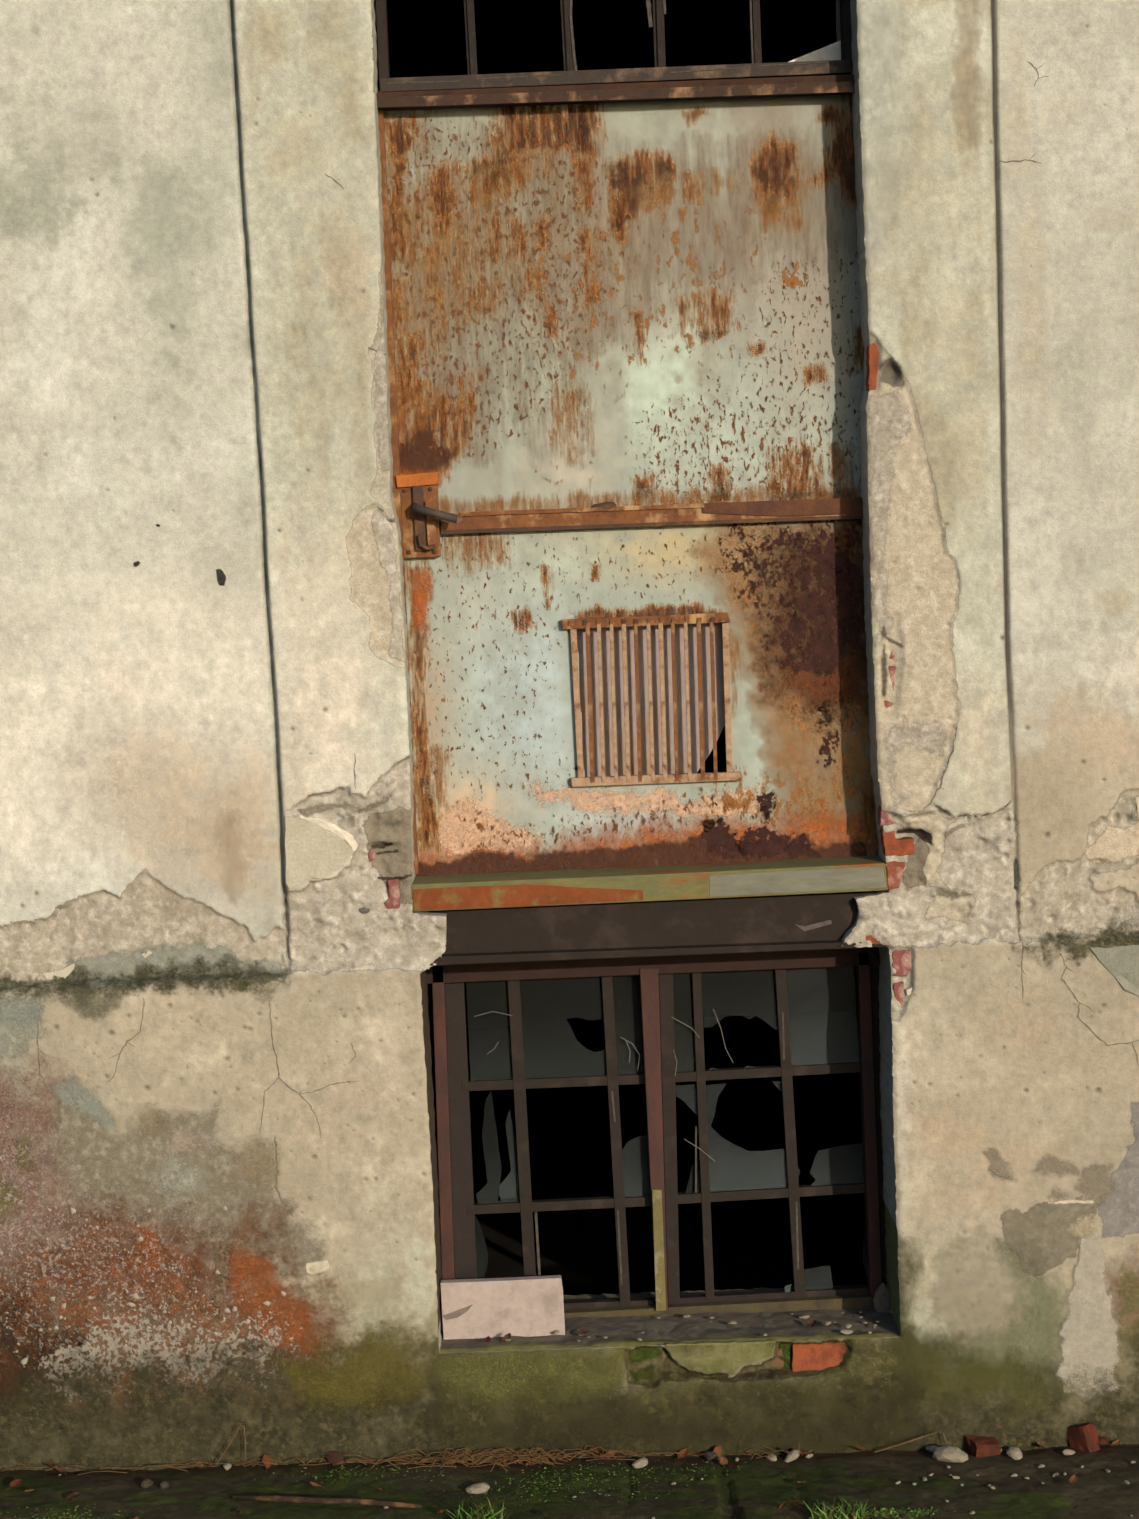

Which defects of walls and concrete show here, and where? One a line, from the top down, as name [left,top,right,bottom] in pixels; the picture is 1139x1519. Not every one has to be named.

flaking render [346,269,405,668]
rust [384,94,879,876]
flaking render [842,333,1139,1022]
flaking render [0,755,446,991]
peeling [795,920,832,931]
crack [259,1003,357,1216]
peeling [985,1148,1012,1179]
peeling [1000,1102,1139,1276]
flaking render [624,1329,853,1385]
leakage [1057,1237,1119,1396]